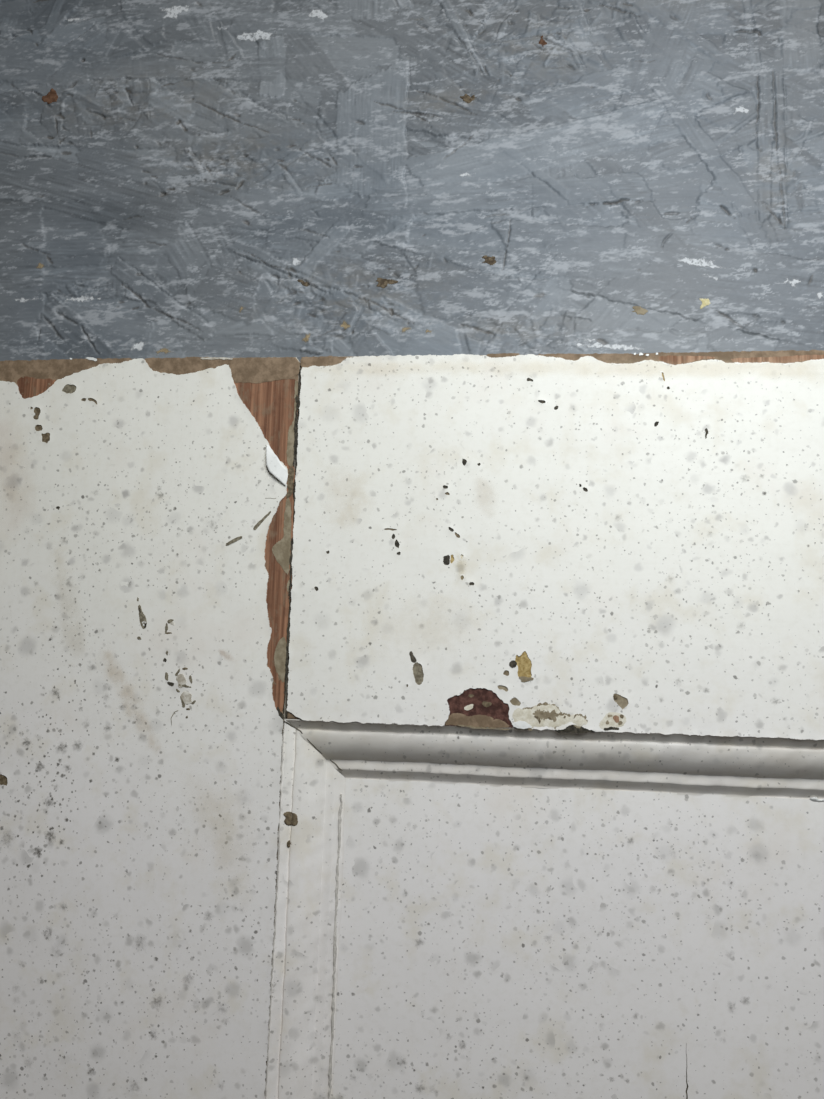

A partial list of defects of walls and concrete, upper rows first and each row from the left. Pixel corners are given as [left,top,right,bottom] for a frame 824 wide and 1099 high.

peeling [0,356,344,719]
peeling [445,651,595,734]
peeling [613,693,629,709]